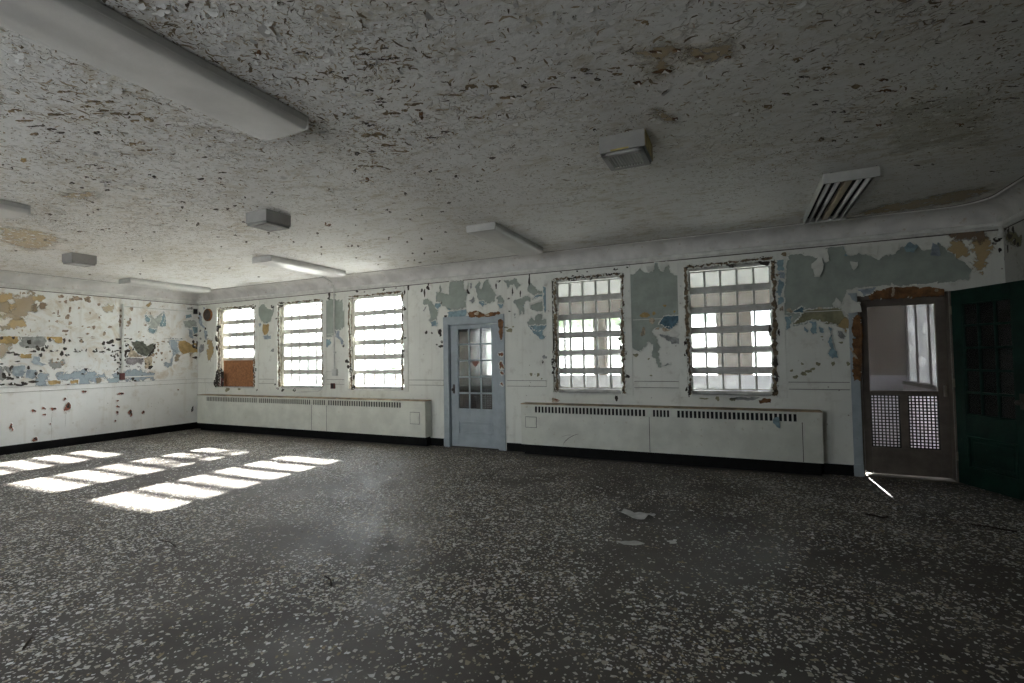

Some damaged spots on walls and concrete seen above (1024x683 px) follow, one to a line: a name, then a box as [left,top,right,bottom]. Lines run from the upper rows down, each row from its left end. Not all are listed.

peeling [0,0,1024,287]
peeling [0,242,973,426]